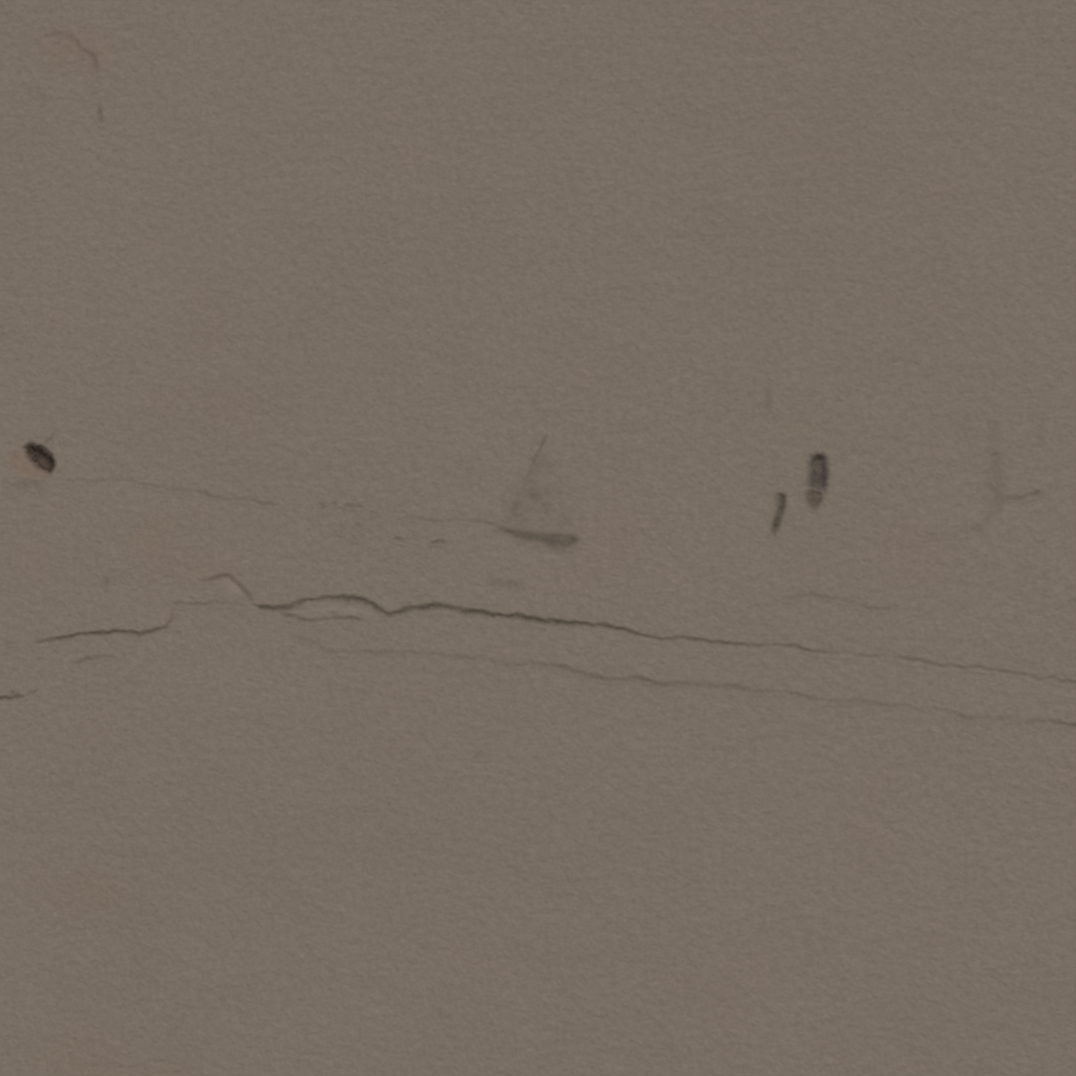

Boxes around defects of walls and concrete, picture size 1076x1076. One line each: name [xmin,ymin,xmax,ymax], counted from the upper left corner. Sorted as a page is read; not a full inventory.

crack [28,571,1076,688]